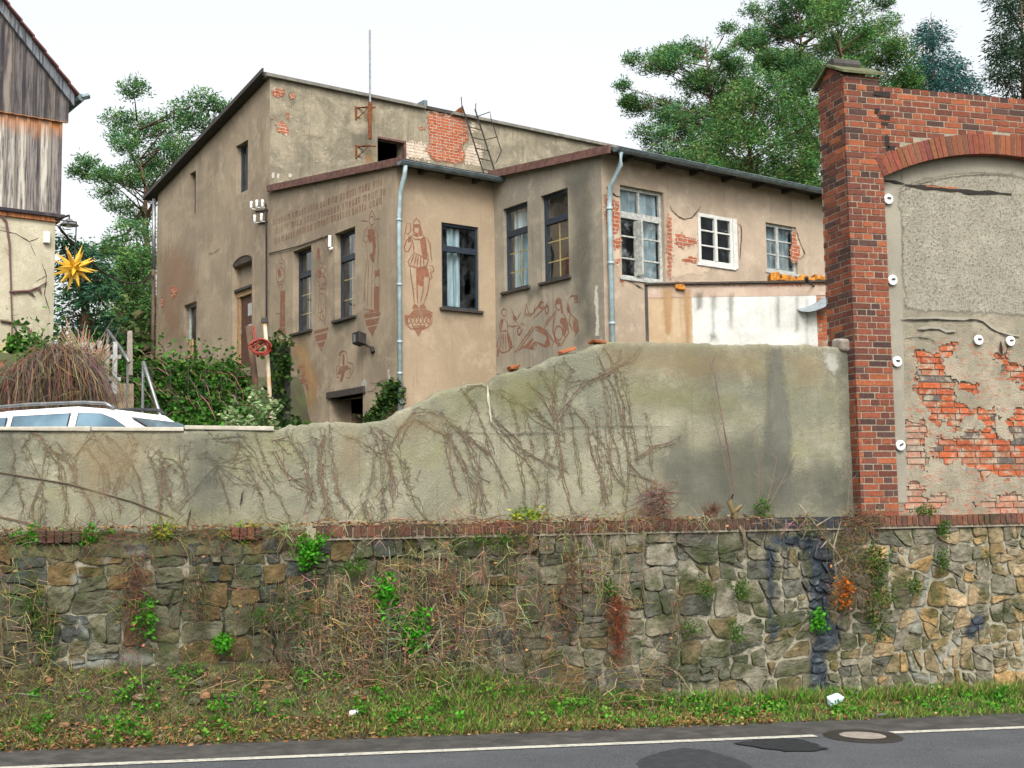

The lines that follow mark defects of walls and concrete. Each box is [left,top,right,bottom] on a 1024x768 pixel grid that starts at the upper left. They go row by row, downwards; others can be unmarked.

flaking render [271,113,297,136]
flaking render [418,113,484,167]
crack [884,174,1022,195]
flaking render [603,193,625,286]
flaking render [665,211,713,287]
flaking render [789,229,803,263]
crack [901,316,1020,356]
spalling [899,342,1024,515]
leakage [765,535,841,691]